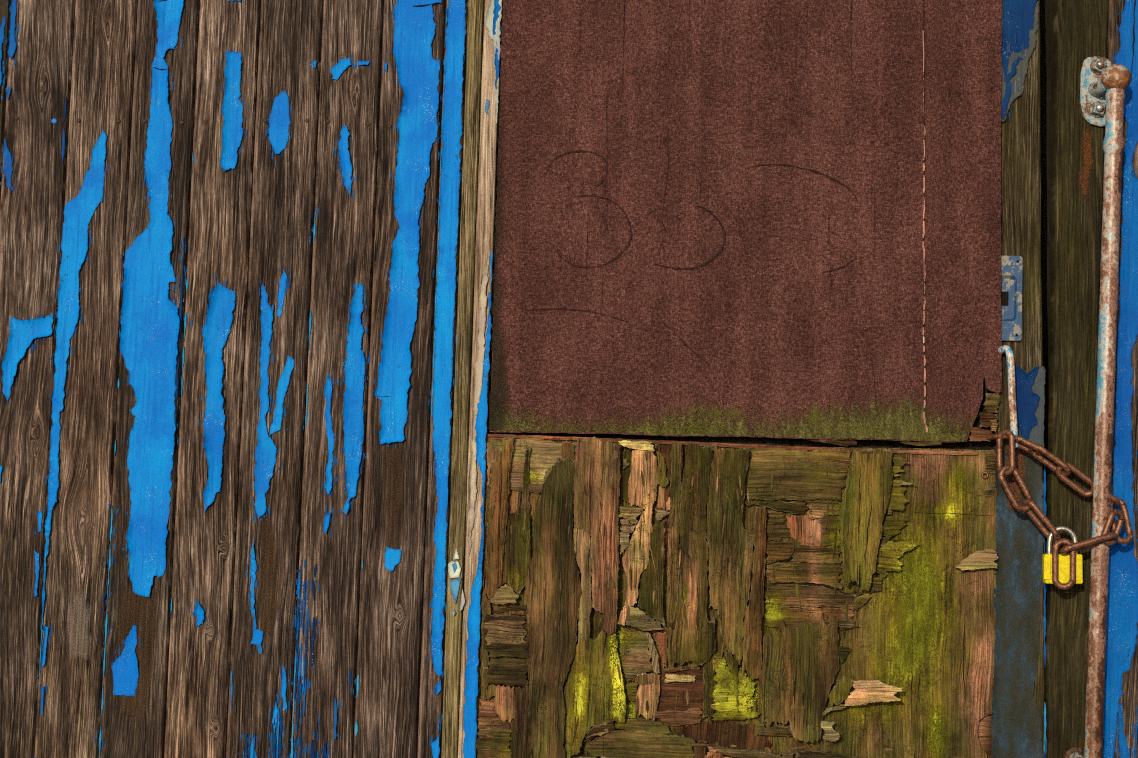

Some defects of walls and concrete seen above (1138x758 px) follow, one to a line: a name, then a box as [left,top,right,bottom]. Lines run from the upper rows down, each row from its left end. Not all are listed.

peeling [0,130,108,716]
peeling [94,0,236,758]
peeling [220,49,249,173]
peeling [250,269,295,523]
peeling [266,90,292,166]
peeling [321,0,493,758]
peeling [485,0,502,124]
leakage [489,119,973,442]
corrosion [1005,447,1025,511]
corrosion [1080,133,1092,194]
peeling [1103,0,1138,758]
peeling [238,559,341,758]